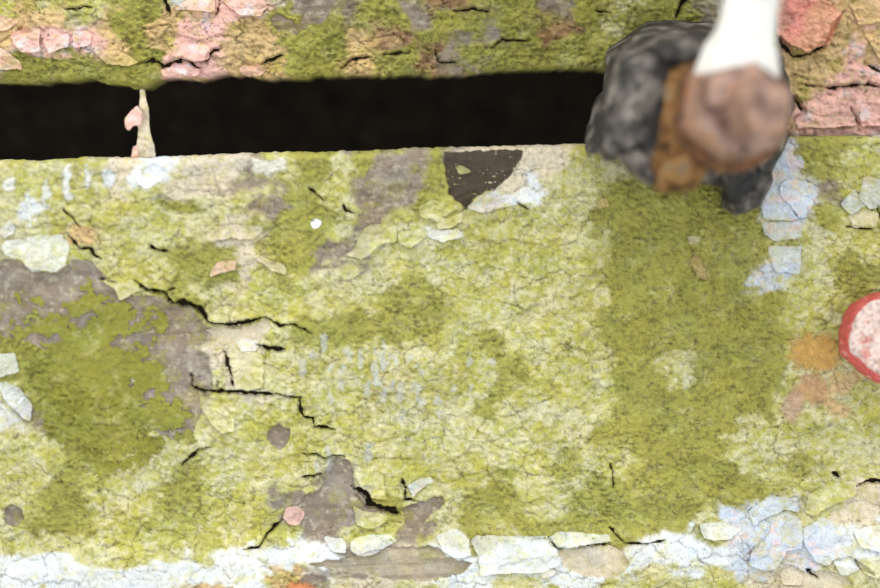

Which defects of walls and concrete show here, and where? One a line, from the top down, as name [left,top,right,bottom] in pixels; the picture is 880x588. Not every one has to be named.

peeling [161,44,211,78]
peeling [776,0,880,59]
peeling [795,91,880,128]
peeling [346,149,523,259]
peeling [0,221,271,439]
crack [139,283,310,351]
crack [191,351,334,429]
crack [182,447,207,464]
crack [303,453,344,477]
crack [832,471,880,486]
peeling [283,456,629,581]
peeling [749,481,880,588]